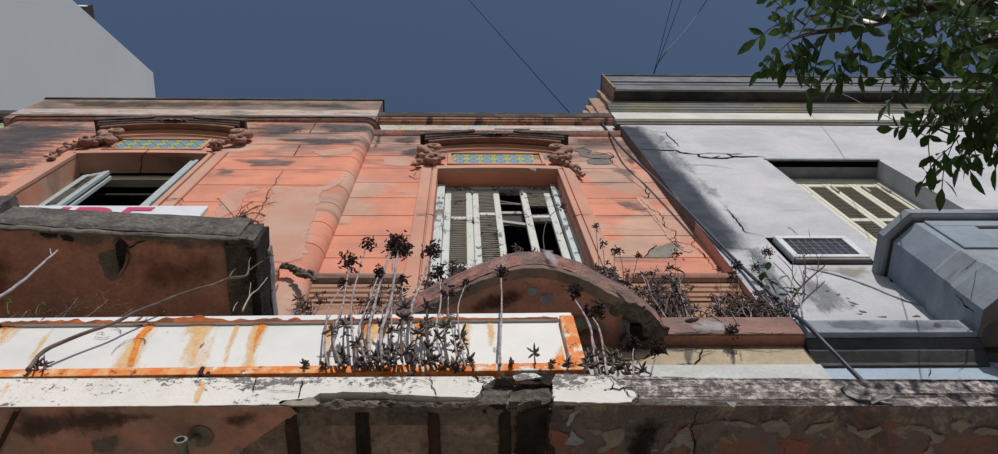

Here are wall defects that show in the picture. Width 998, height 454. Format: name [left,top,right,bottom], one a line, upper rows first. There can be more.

water stain [0,122,92,177]
crack [648,131,766,169]
spalling [213,179,342,316]
crack [640,185,720,273]
corrosion [117,325,154,367]
corrosion [187,325,211,364]
corrosion [244,324,267,367]
corrosion [363,322,390,345]
spalling [231,373,625,454]
peeling [840,386,894,405]
peeling [650,424,694,454]
peeling [906,419,998,454]